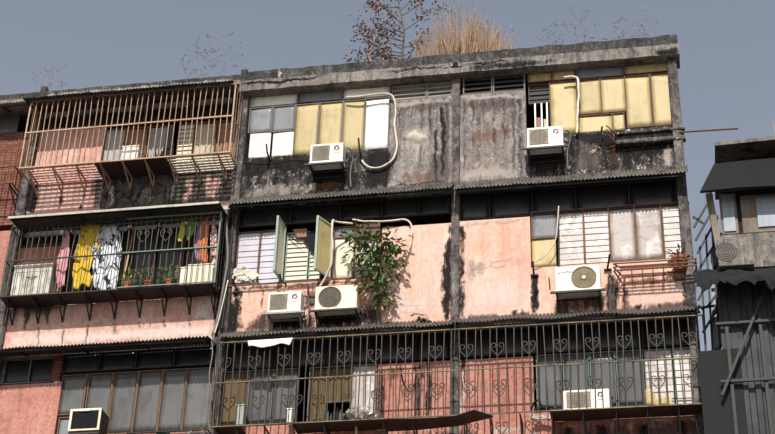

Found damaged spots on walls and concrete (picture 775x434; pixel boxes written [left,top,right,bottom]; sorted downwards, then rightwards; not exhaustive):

water stain [243,149,393,197]
water stain [397,98,451,184]
water stain [462,94,521,137]
water stain [92,160,376,337]
water stain [422,219,539,322]